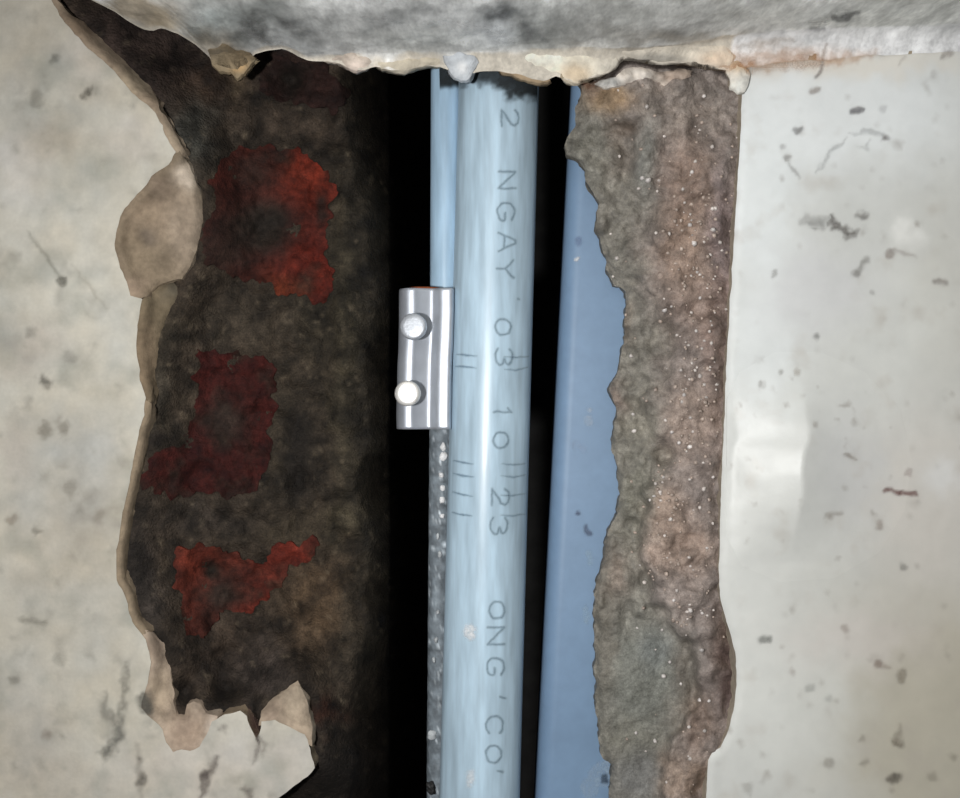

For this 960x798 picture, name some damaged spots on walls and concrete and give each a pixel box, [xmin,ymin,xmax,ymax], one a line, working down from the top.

spalling [52,0,479,798]
spalling [498,45,751,798]